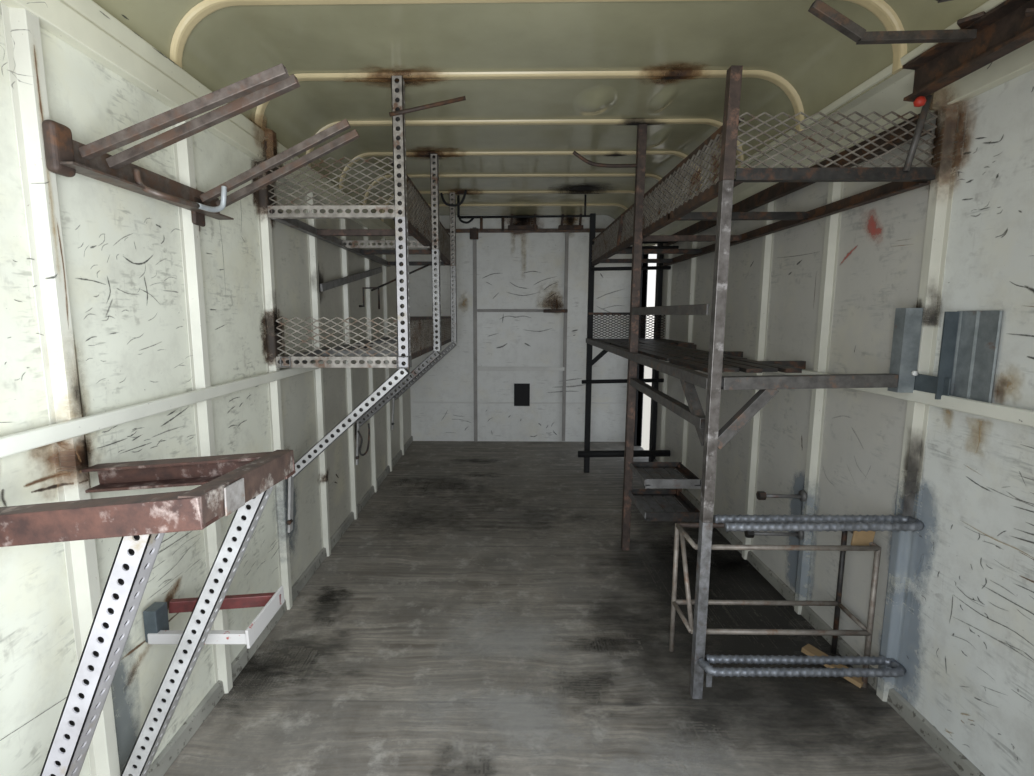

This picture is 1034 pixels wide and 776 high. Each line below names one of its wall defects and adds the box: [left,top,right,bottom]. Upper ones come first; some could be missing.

corrosion [367,70,436,85]
corrosion [649,63,701,84]
corrosion [930,90,970,184]
corrosion [261,308,285,365]
corrosion [25,437,90,493]